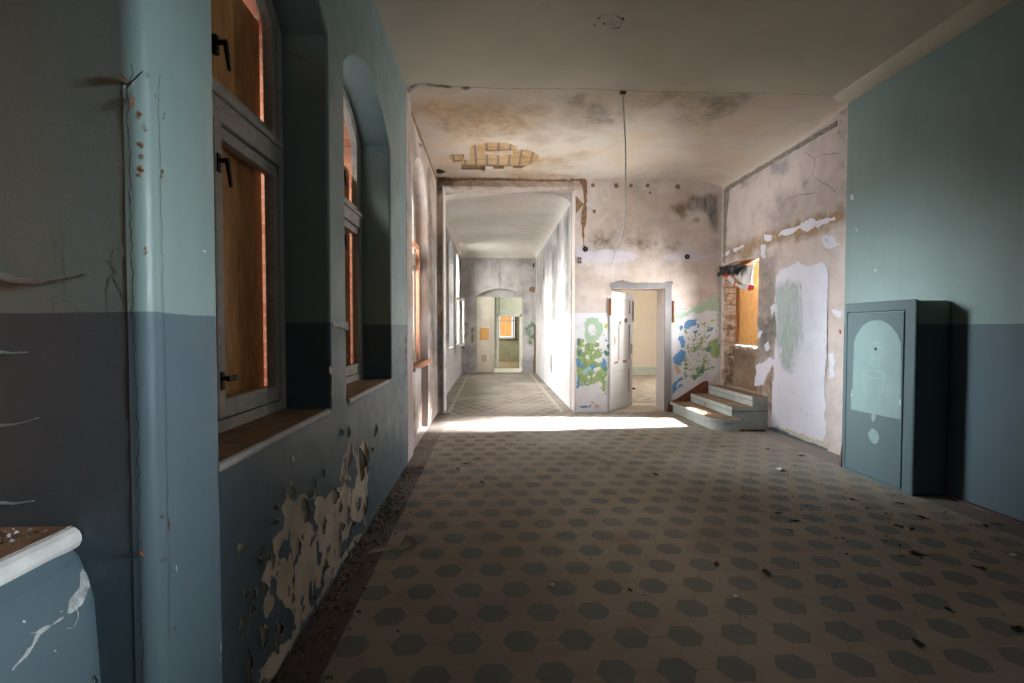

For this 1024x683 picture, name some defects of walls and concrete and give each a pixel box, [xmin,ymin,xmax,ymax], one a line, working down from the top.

flaking render [449,142,539,165]
peeling [768,261,831,450]
peeling [238,424,378,683]